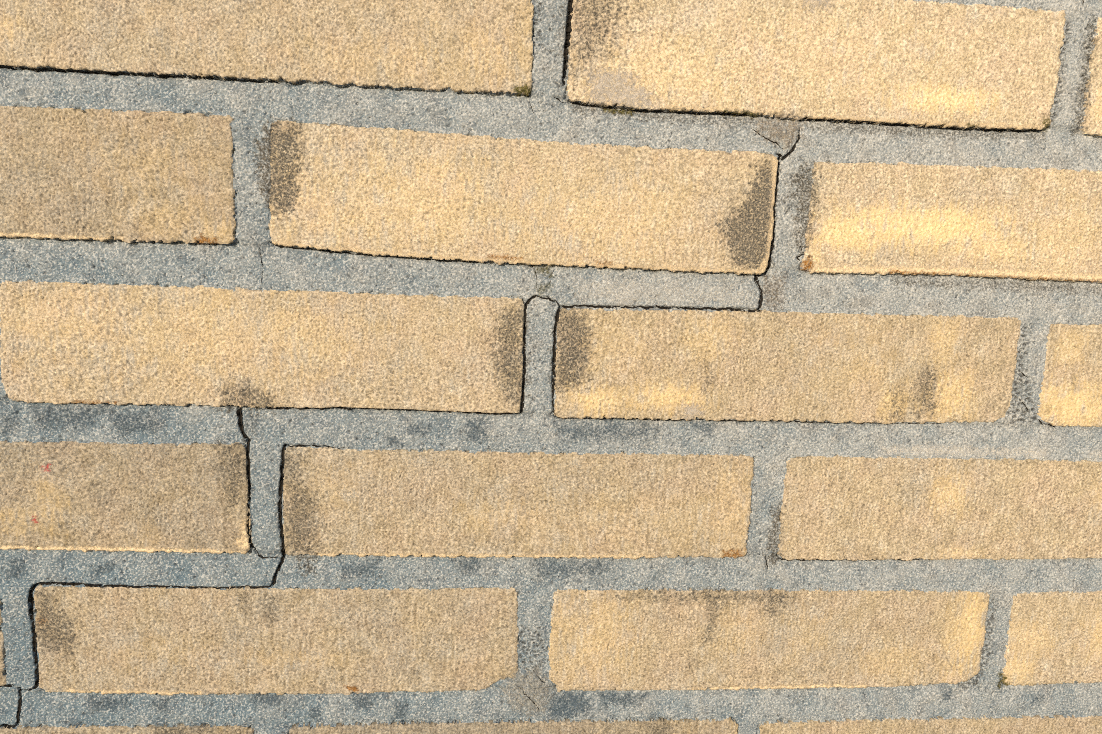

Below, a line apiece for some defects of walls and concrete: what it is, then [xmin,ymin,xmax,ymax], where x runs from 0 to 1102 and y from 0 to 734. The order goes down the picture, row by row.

crack [529,0,573,113]
crack [0,127,800,729]